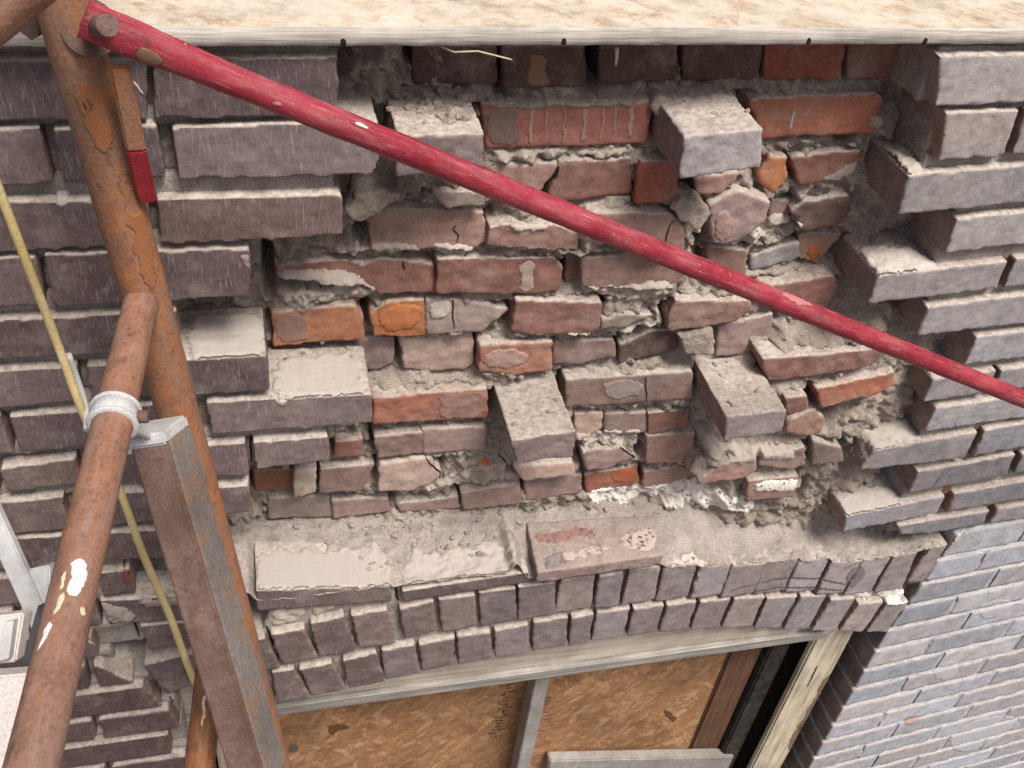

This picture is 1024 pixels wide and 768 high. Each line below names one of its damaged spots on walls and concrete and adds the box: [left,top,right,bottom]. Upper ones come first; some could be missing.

spalling [353,82,398,110]
spalling [823,162,857,181]
spalling [714,210,734,242]
peeling [782,292,812,306]
spalling [378,304,423,332]
peeling [483,348,529,370]
peeling [603,379,644,400]